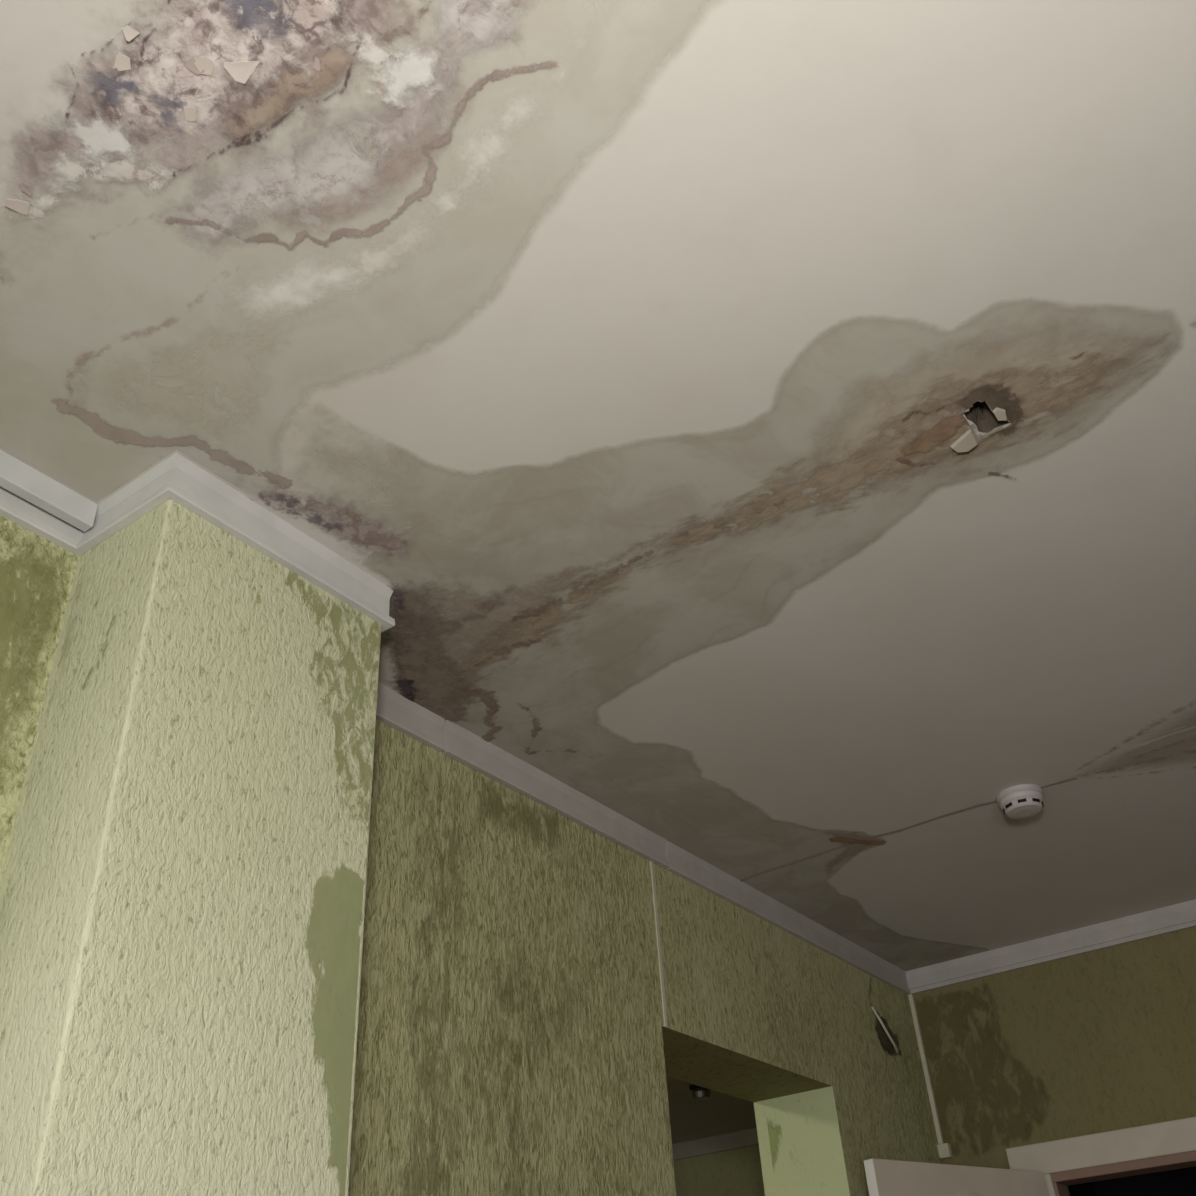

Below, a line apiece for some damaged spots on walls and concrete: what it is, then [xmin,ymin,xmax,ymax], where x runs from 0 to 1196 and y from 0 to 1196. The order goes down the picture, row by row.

peeling [4,0,440,224]
water stain [0,0,1178,971]
spalling [816,332,1146,483]
water stain [306,865,364,1196]
water stain [918,986,1046,1154]